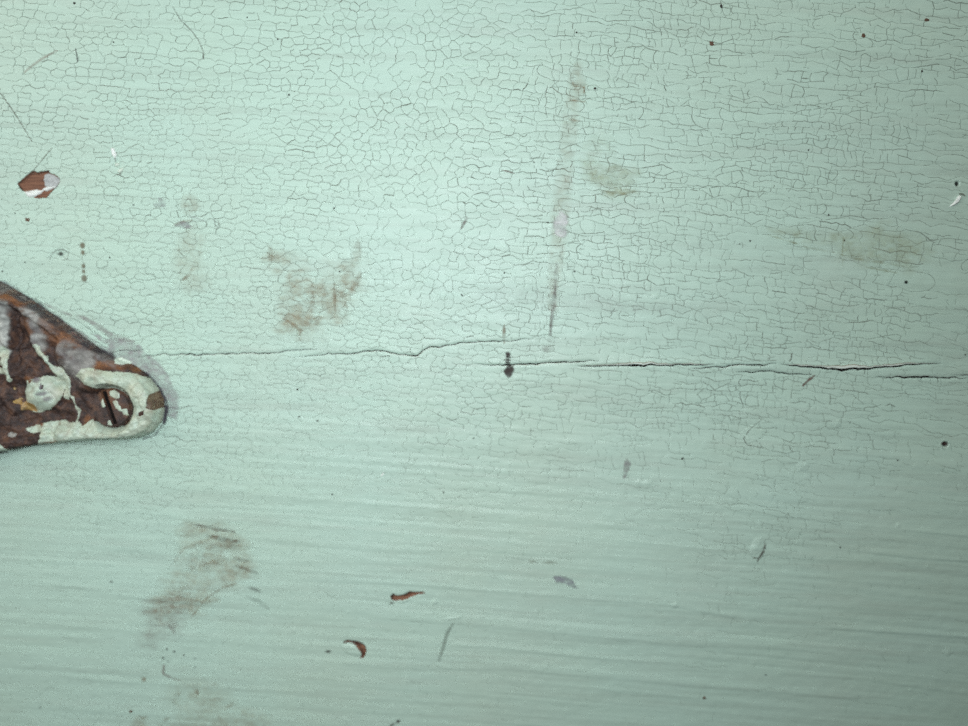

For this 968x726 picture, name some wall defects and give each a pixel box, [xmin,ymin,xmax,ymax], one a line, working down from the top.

peeling [17,170,60,198]
crack [107,338,968,383]